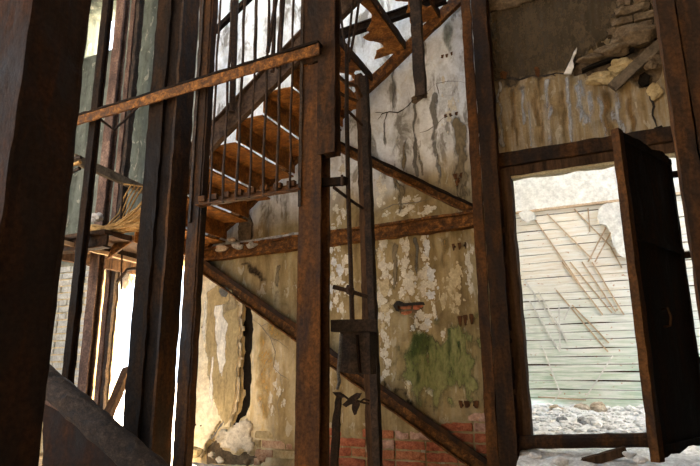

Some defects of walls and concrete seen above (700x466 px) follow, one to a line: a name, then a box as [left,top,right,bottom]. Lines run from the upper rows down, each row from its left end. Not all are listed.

flaking render [606,0,656,38]
water stain [394,103,423,177]
water stain [429,92,441,177]
water stain [451,117,467,197]
water stain [565,77,625,142]
spalling [638,72,650,88]
peeling [330,246,349,319]
peeling [376,235,474,383]
corrosion [457,314,473,326]
corrosion [258,326,279,417]
flaking render [329,428,368,466]
flaking render [382,430,466,466]